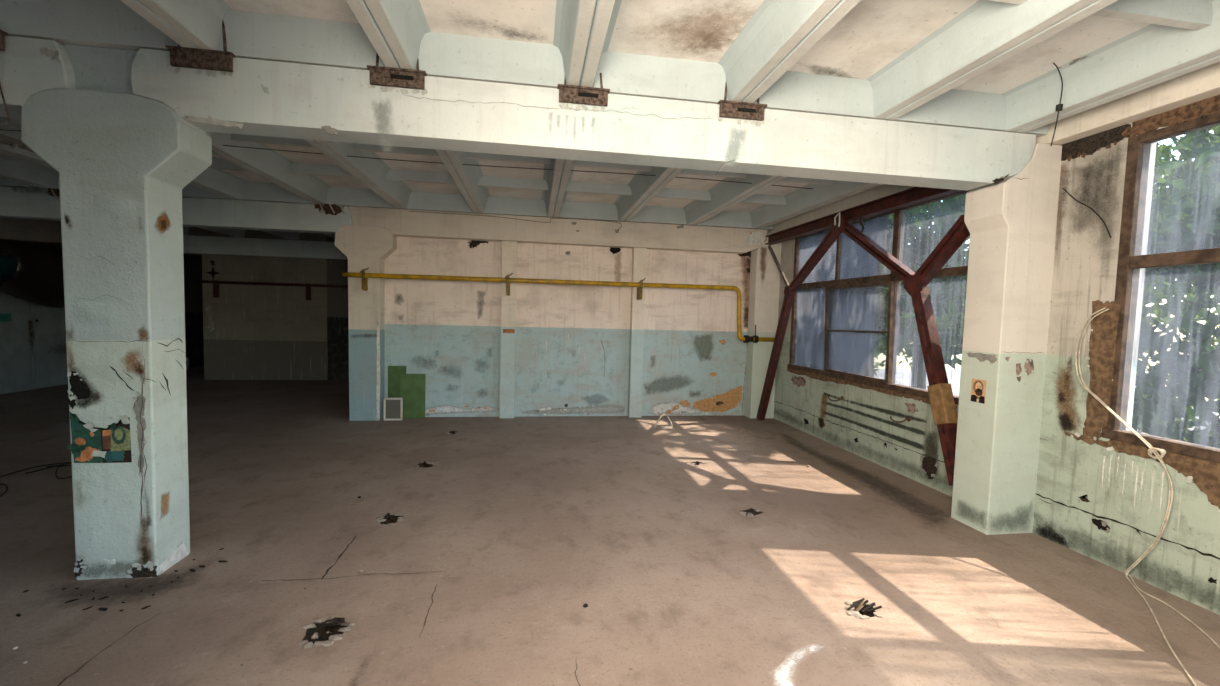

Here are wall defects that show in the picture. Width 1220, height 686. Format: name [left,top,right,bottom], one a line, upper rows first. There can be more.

leakage [1078,161,1115,239]
corrosion [156,213,170,232]
corrosion [126,353,144,379]
spalling [67,371,90,409]
flaking render [652,385,744,416]
flaking render [786,363,930,415]
flaking render [1065,300,1220,512]
leakage [959,504,1028,527]